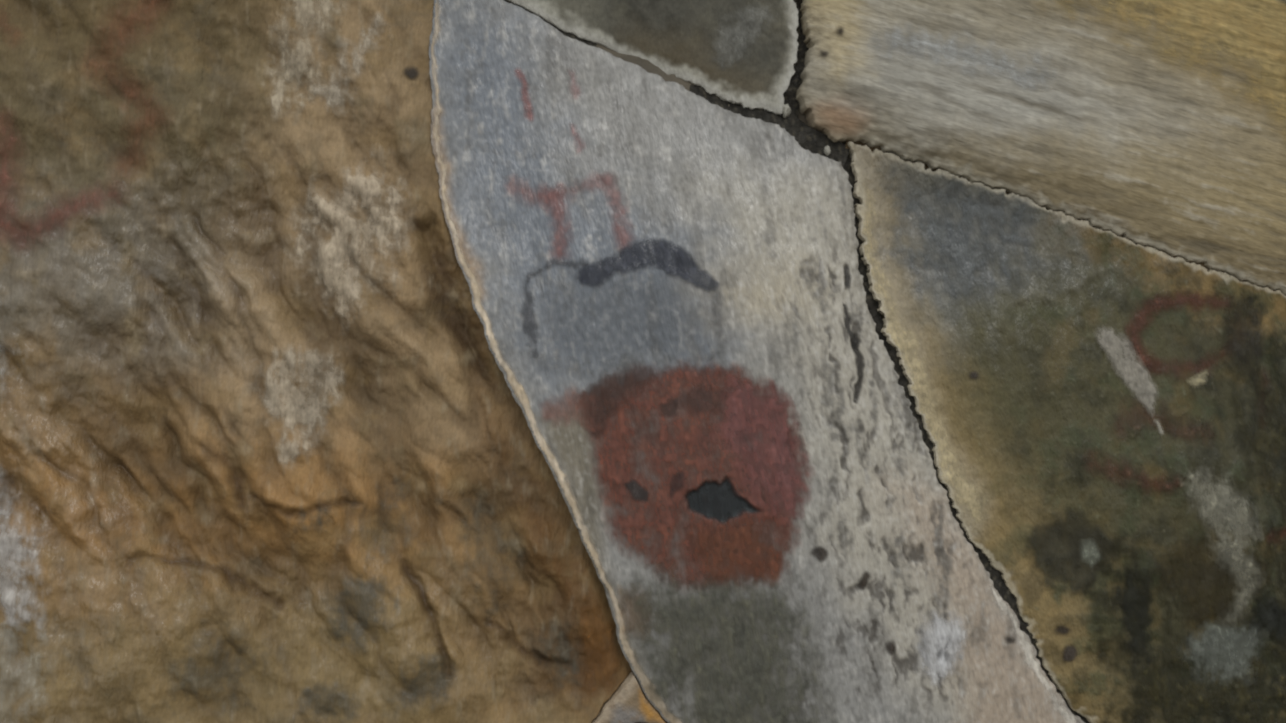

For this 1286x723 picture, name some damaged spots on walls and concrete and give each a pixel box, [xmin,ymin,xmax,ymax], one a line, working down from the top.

crack [504,0,597,47]
water stain [431,0,819,723]
crack [690,0,1089,723]
water stain [1030,297,1286,723]
crack [1078,219,1286,296]